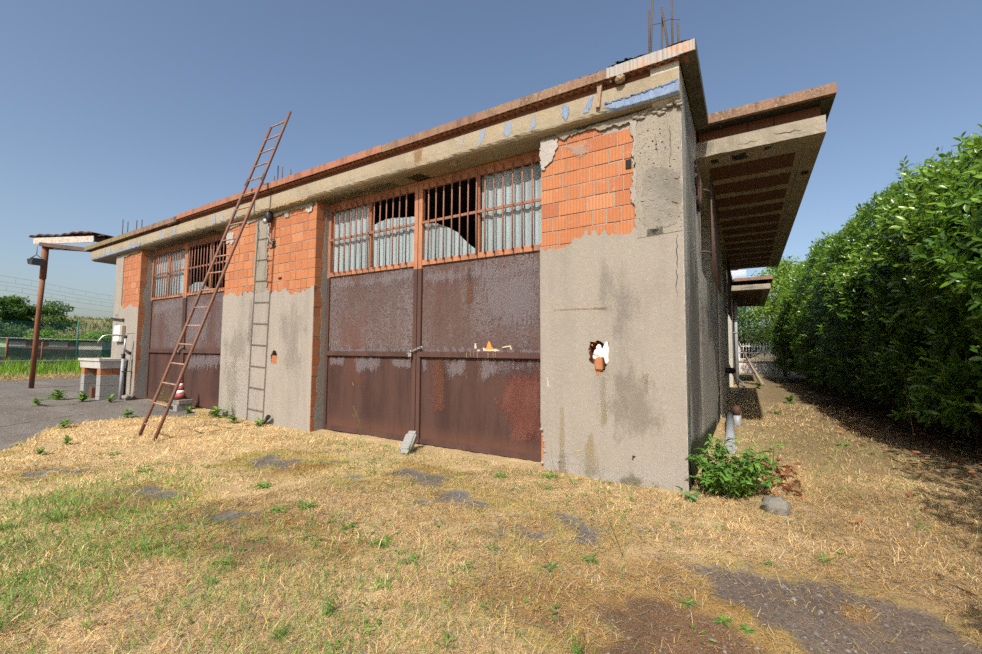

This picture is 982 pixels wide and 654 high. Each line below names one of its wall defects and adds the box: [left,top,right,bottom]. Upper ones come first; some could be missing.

peeling [539,79,682,251]
peeling [92,220,143,309]
peeling [213,197,318,296]
spalling [589,341,609,376]
rust [500,368,541,441]